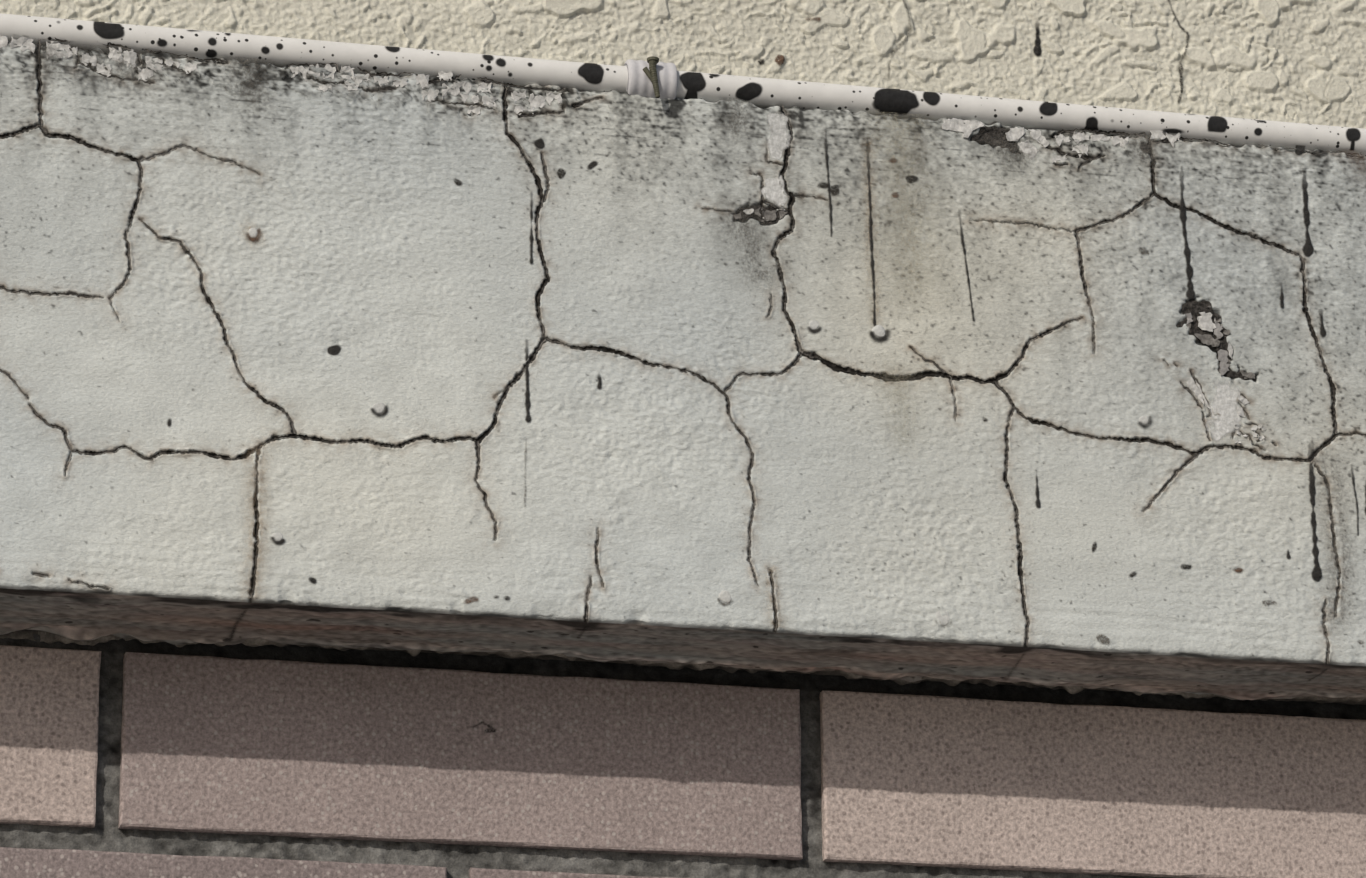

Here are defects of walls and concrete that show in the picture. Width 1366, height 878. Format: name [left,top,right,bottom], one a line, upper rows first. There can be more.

damp [680,72,719,99]
damp [729,82,762,134]
damp [873,88,940,128]
damp [1039,101,1057,116]
spalling [941,118,1236,168]
damp [1208,116,1227,132]
damp [1346,128,1360,150]
damp [867,158,876,326]
damp [1180,181,1195,299]
damp [1302,179,1314,256]
crack [0,40,1366,662]
spalling [1164,300,1276,451]